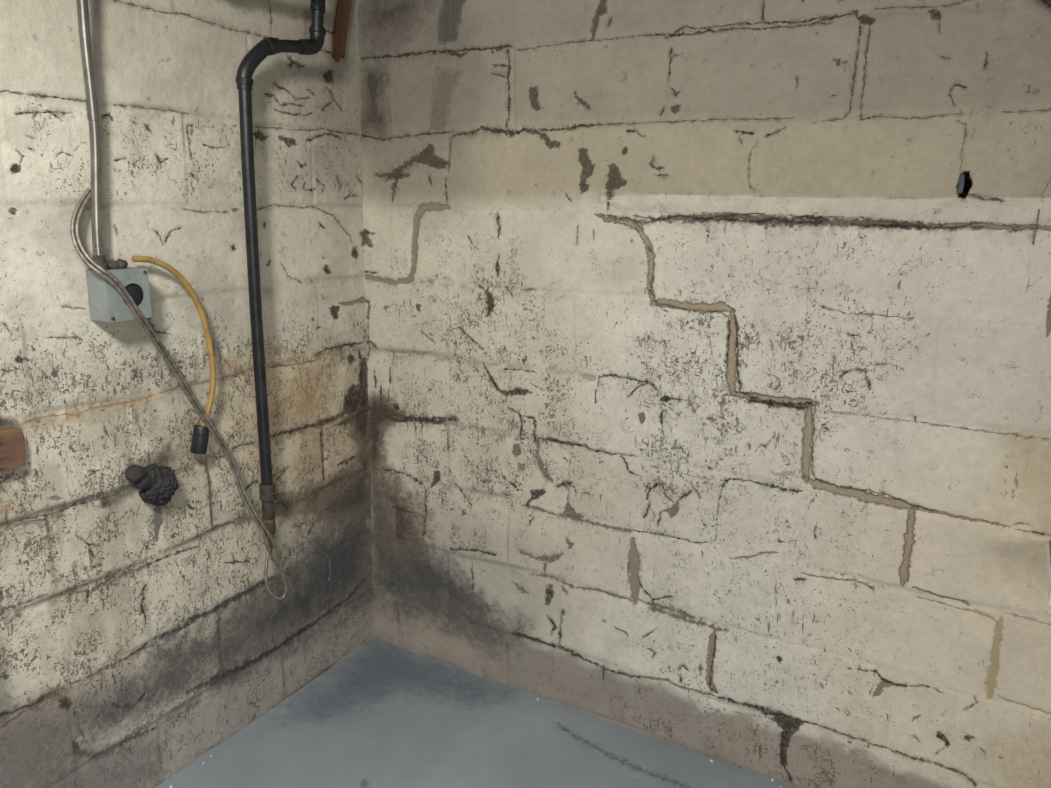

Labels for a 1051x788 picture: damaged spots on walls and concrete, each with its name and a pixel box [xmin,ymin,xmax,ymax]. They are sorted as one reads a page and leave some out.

crack [253,1,966,187]
crack [25,202,450,423]
crack [0,464,272,769]
crack [187,579,365,694]
crack [232,396,361,506]
water stain [89,396,524,723]
crack [386,469,427,535]
crack [385,404,458,430]
crack [450,548,496,590]
crack [462,213,1051,714]
crack [790,718,977,786]